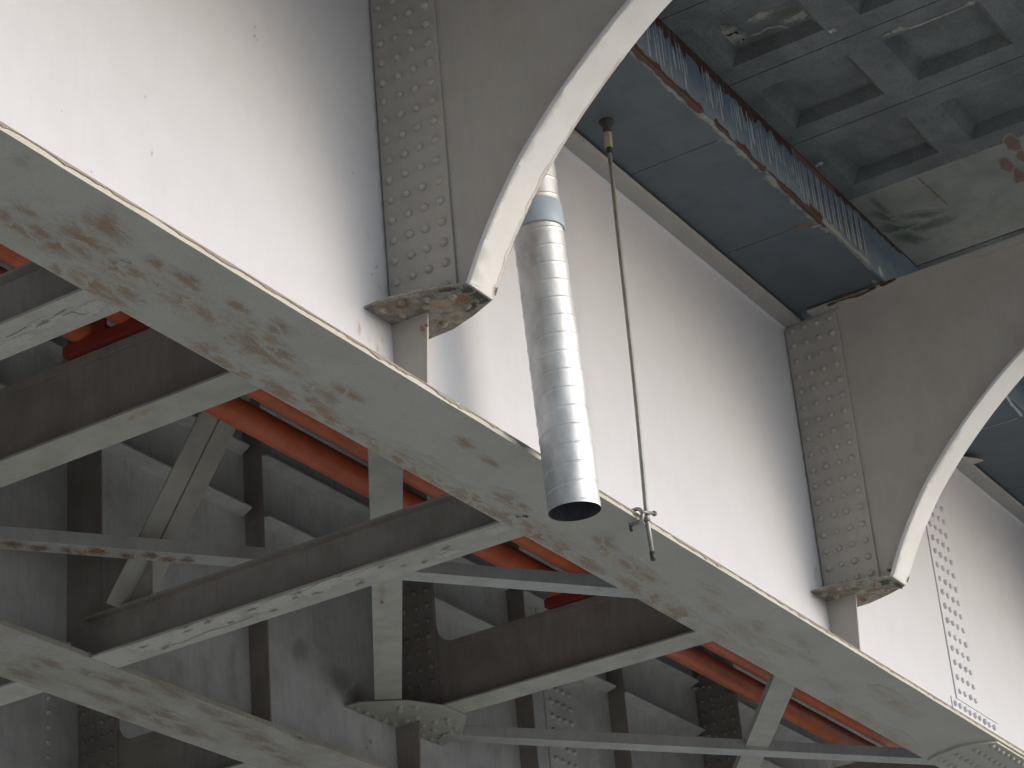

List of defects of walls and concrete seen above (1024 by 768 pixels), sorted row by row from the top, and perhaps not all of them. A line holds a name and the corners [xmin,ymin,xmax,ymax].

leakage [641,21,688,92]
leakage [701,66,884,284]
rust [0,195,921,756]